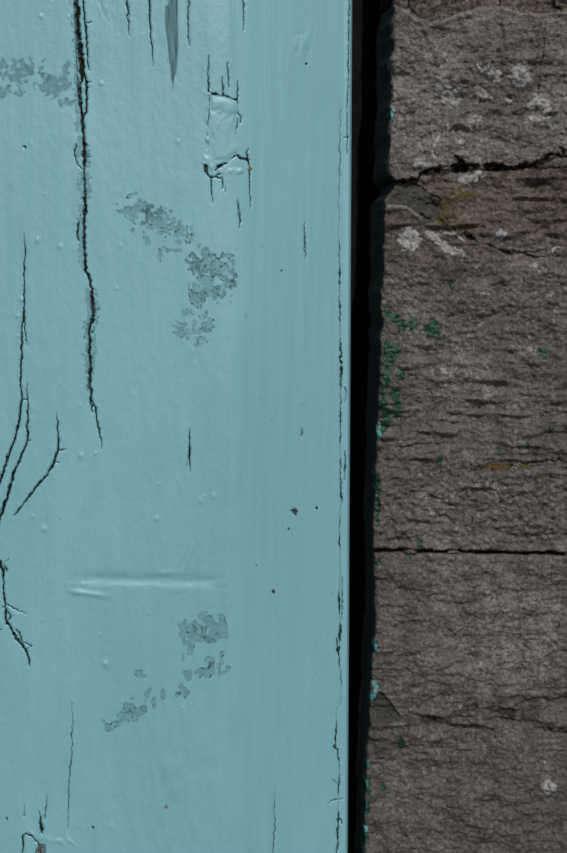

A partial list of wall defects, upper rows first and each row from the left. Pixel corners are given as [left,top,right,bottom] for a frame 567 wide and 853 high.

peeling [164,0,178,92]
crack [207,56,242,137]
crack [74,0,102,447]
peeling [116,193,238,347]
crack [206,151,251,228]
crack [381,147,567,258]
crack [0,242,65,520]
crack [339,240,347,569]
crack [0,561,32,666]
peeling [177,614,231,698]
crack [330,592,343,852]
crack [22,796,47,853]